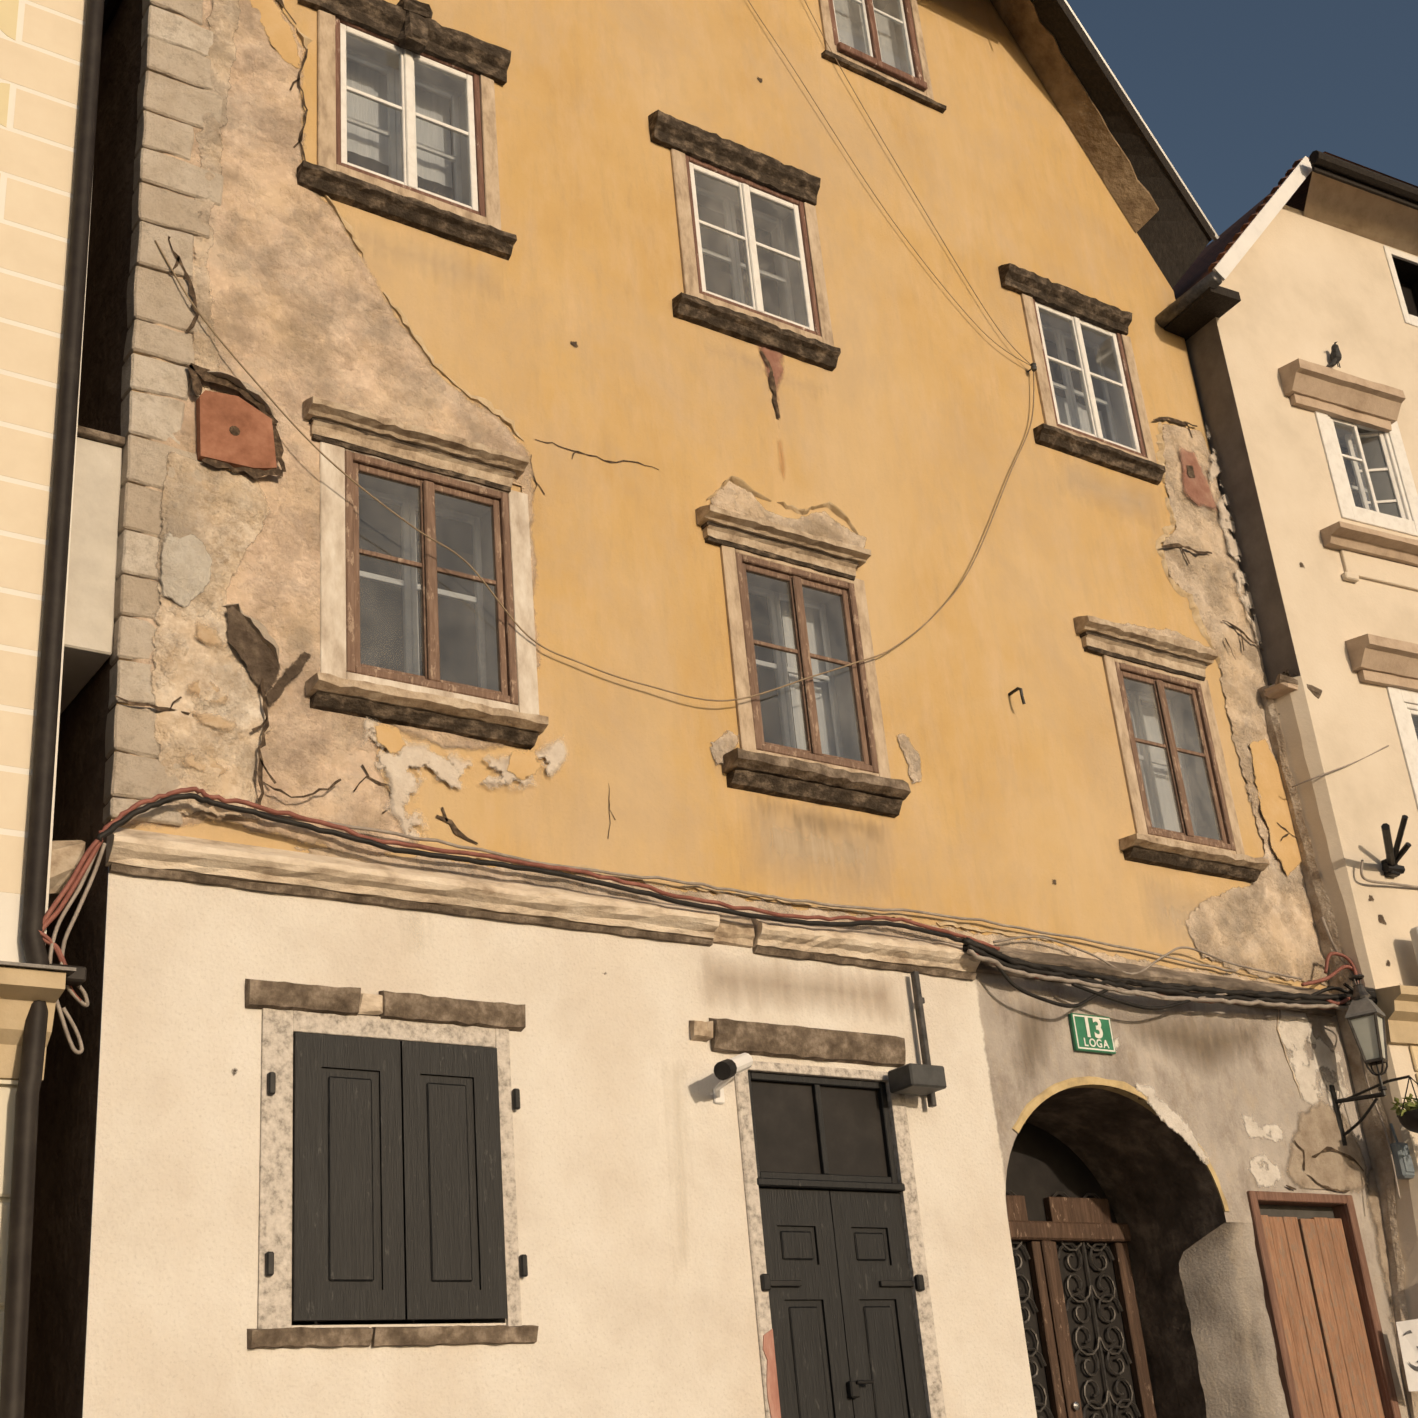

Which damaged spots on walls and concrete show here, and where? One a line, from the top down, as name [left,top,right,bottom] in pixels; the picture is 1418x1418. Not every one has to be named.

crack [279,0,308,161]
corrosion [760,347,783,418]
crack [530,439,659,495]
flaking render [128,0,1329,986]
crack [252,678,392,814]
flaking render [1241,1010,1397,1333]